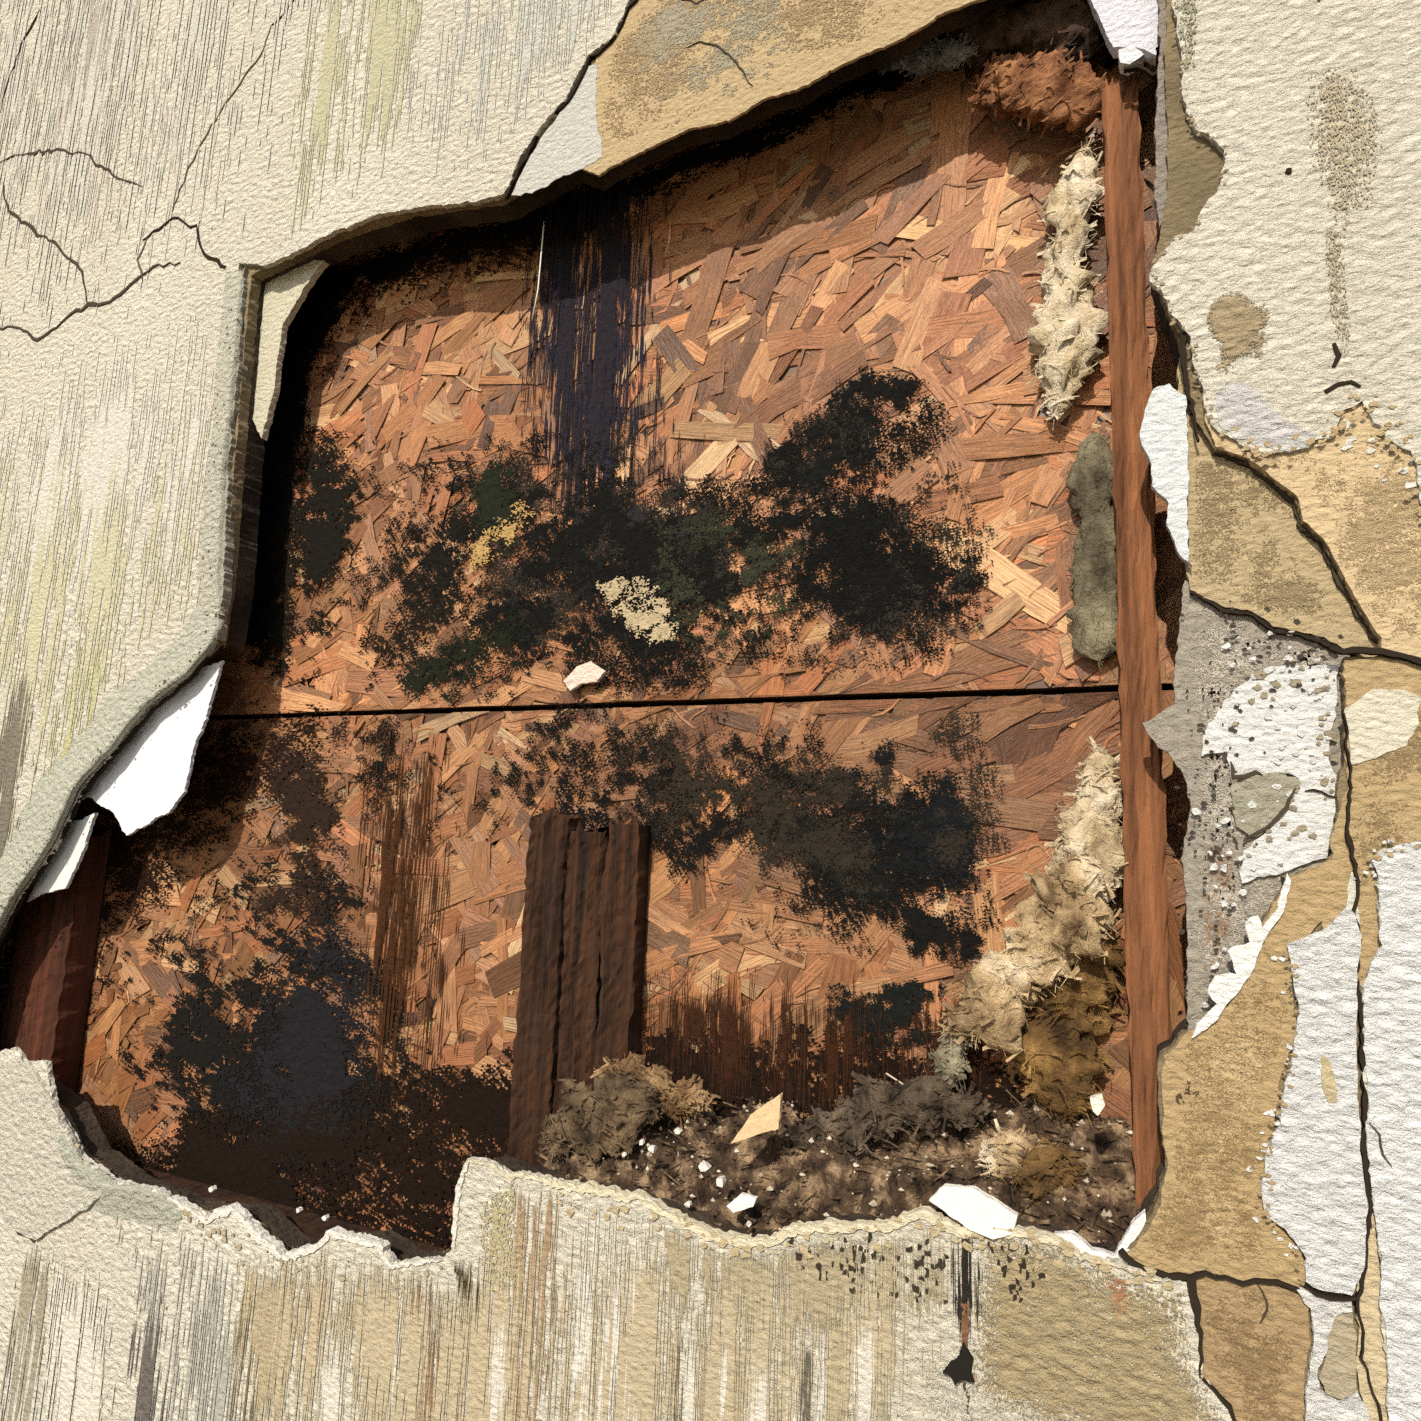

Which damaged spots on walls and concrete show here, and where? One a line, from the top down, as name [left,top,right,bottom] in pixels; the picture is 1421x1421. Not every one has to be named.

crack [0,0,294,342]
leakage [0,0,334,331]
crack [504,0,638,200]
crack [686,41,753,86]
spalling [511,0,986,196]
leakage [0,313,215,660]
crack [0,644,224,946]
leakage [88,67,1032,1249]
spalling [564,661,607,692]
peeling [0,1061,102,1240]
peeling [153,1208,318,1273]
leakage [0,1180,1225,1421]